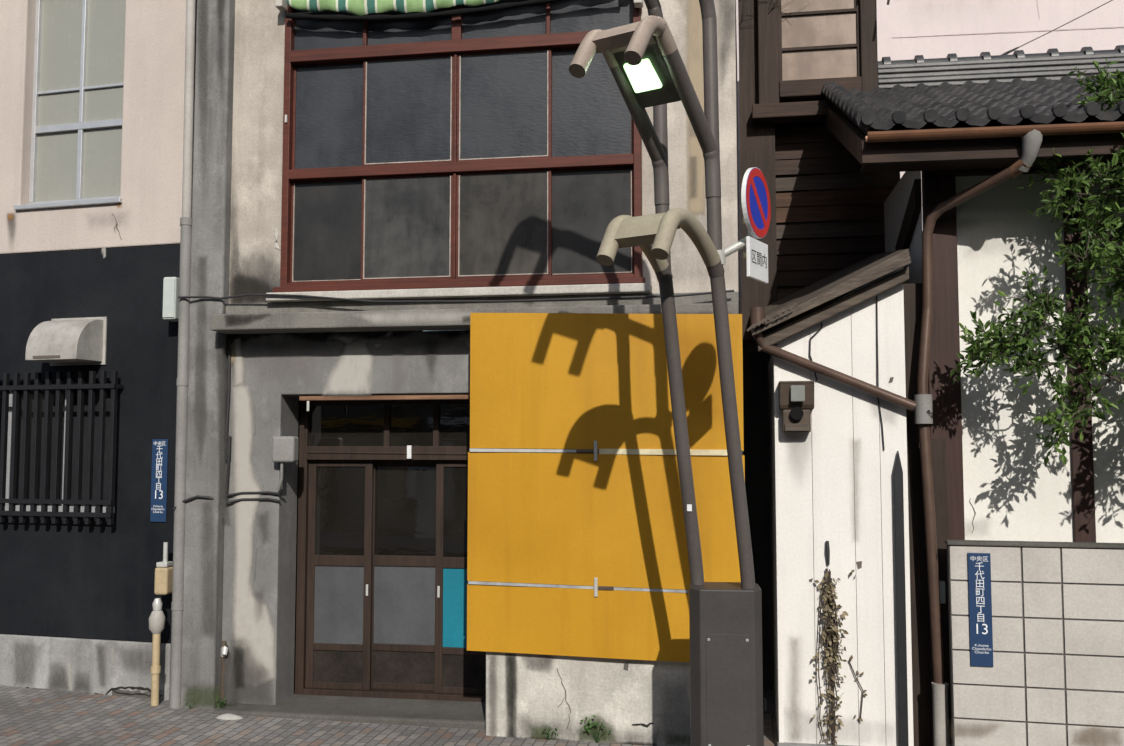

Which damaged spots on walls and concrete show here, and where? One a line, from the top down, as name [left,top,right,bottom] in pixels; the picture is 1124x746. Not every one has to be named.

water stain [200,0,222,111]
water stain [196,350,205,428]
peeling [233,339,275,684]
water stain [50,662,87,690]
crack [557,668,571,728]